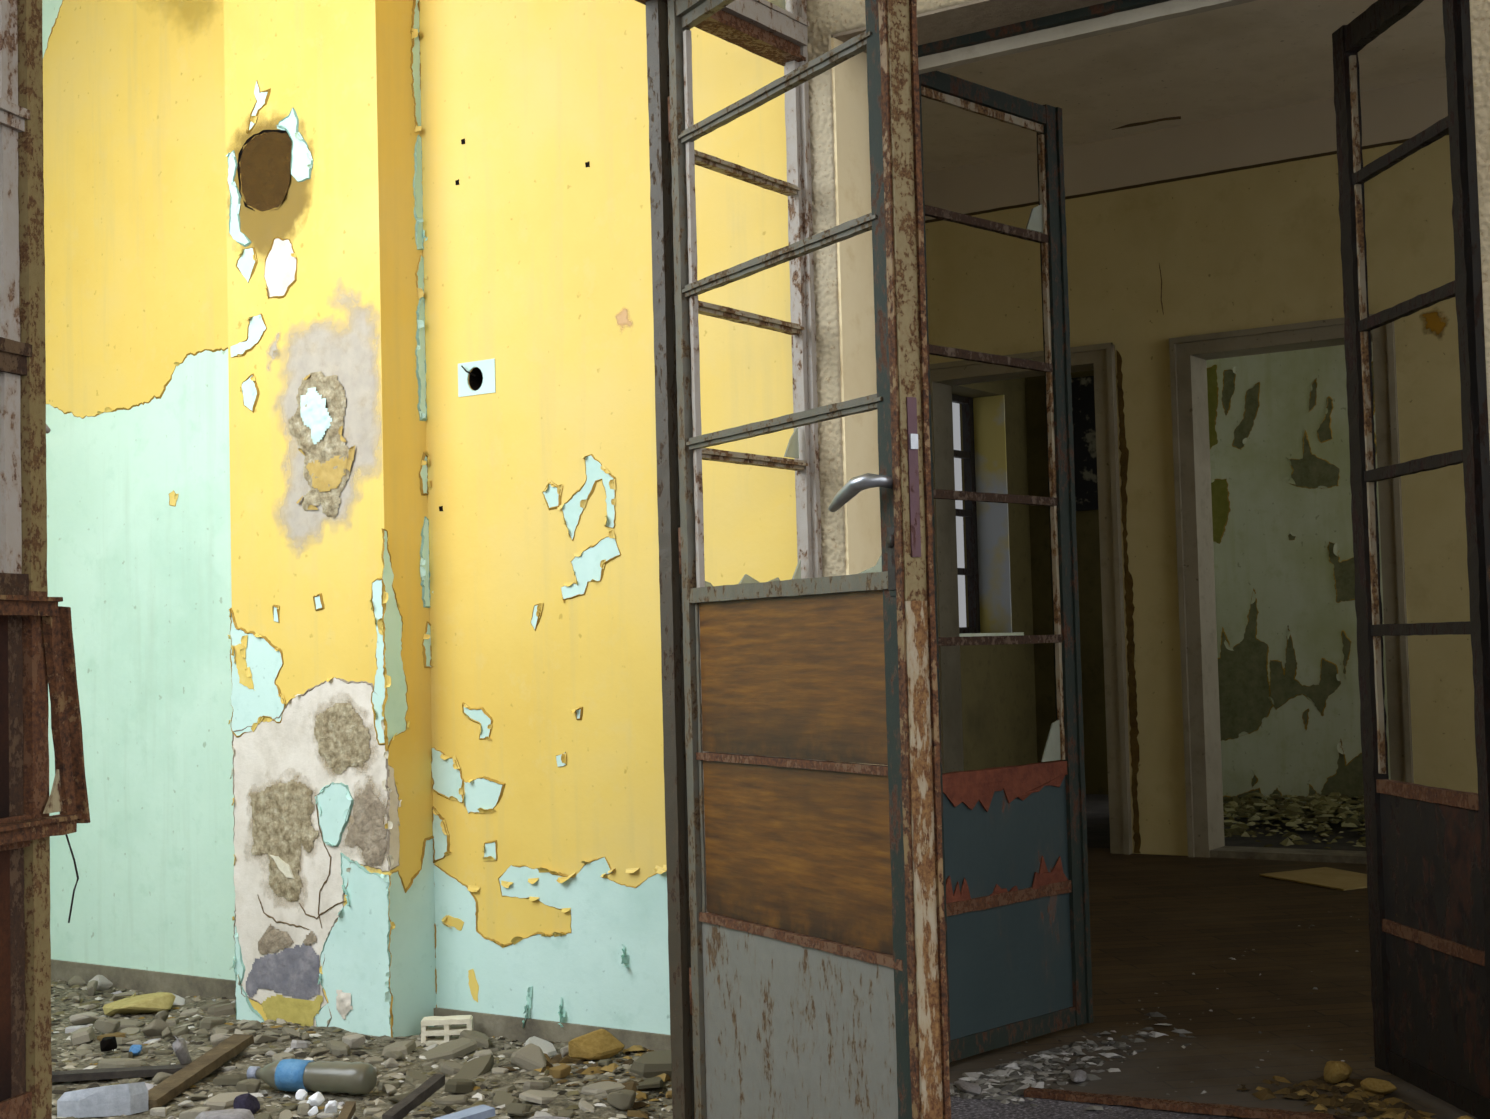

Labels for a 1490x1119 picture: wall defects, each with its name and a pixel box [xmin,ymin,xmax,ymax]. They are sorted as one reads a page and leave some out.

peeling [43,0,298,419]
peeling [276,108,313,182]
peeling [410,0,428,421]
spalling [288,371,355,518]
peeling [419,450,431,496]
peeling [228,516,670,1038]
peeling [542,454,621,602]
peeling [1206,345,1365,821]
peeling [1371,342,1391,780]